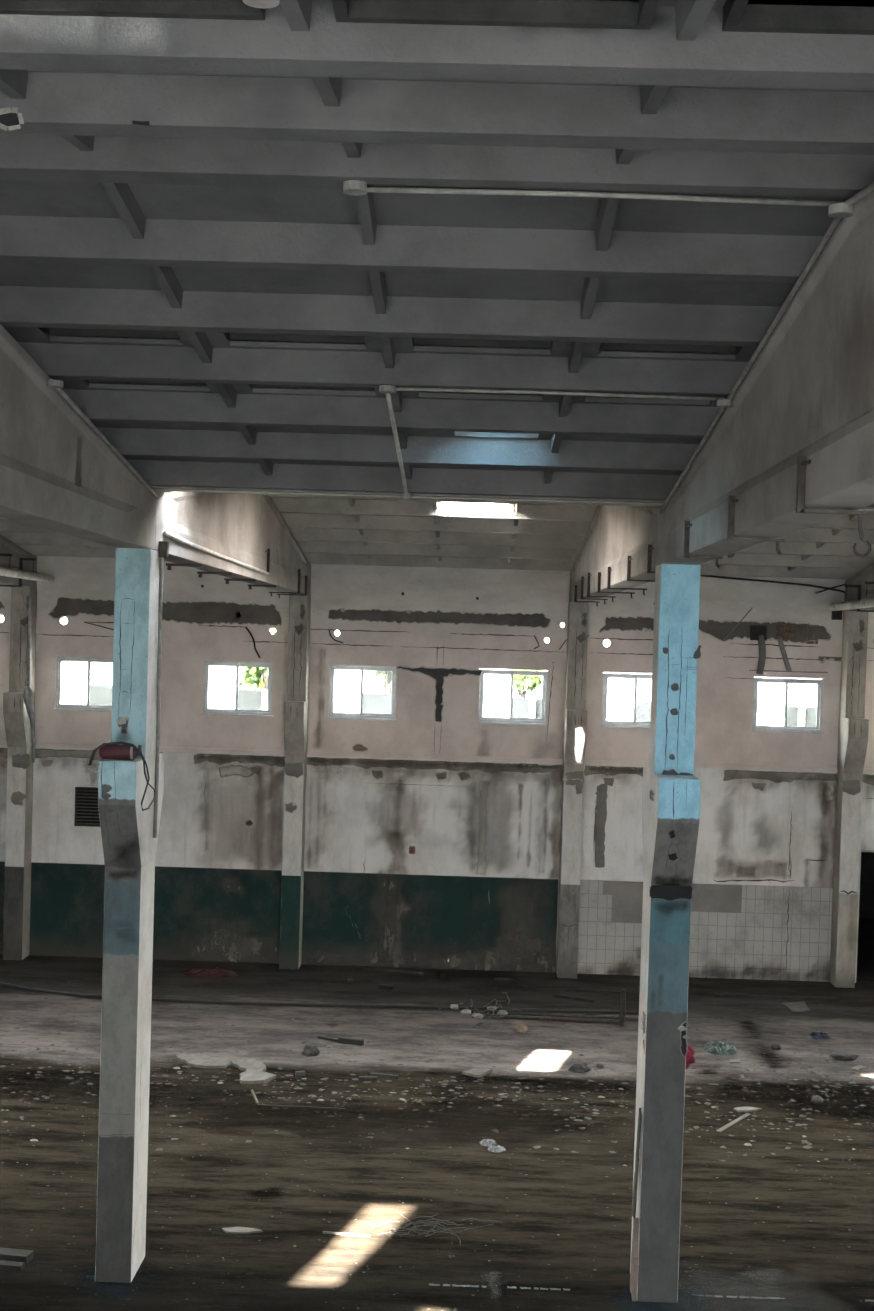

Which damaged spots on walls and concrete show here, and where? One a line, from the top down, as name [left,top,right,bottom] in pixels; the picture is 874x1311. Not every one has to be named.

flaking render [0,595,29,627]
flaking render [48,596,114,626]
flaking render [162,584,307,636]
flaking render [693,619,874,664]
water stain [529,817,561,878]